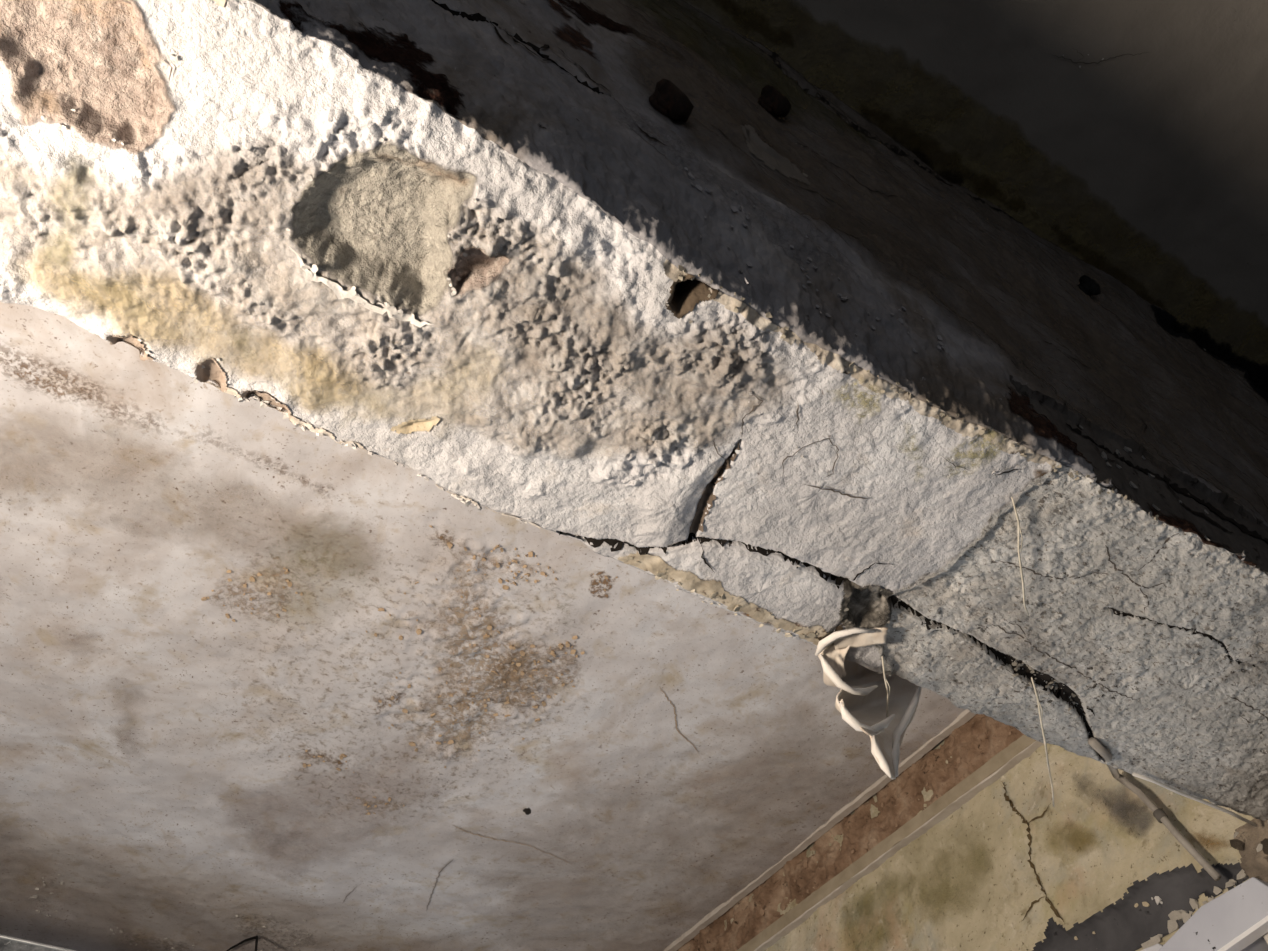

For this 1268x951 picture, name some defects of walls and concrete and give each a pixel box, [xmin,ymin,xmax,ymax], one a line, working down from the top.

flaking render [0,0,175,154]
rust [279,0,464,119]
rust [548,0,653,60]
peeling [741,125,810,185]
flaking render [45,138,538,365]
leakage [0,353,100,399]
crack [559,391,893,589]
flaking render [618,259,1268,951]
crack [888,595,1137,757]
crack [997,424,1268,667]
crack [1002,782,1064,922]
leakage [1105,794,1151,831]